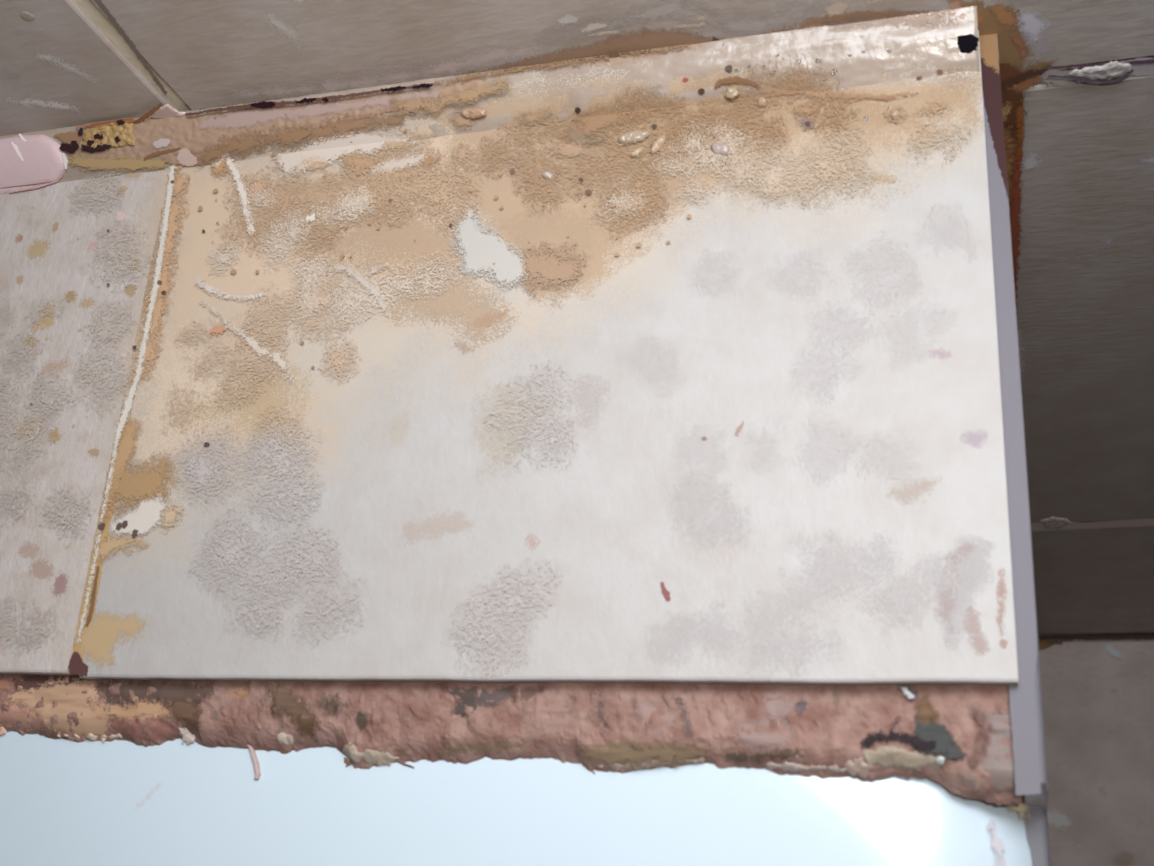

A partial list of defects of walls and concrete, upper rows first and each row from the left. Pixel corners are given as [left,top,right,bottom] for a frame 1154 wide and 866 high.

rust [948,0,1057,319]
water stain [0,0,1008,655]
peeling [0,651,1022,806]